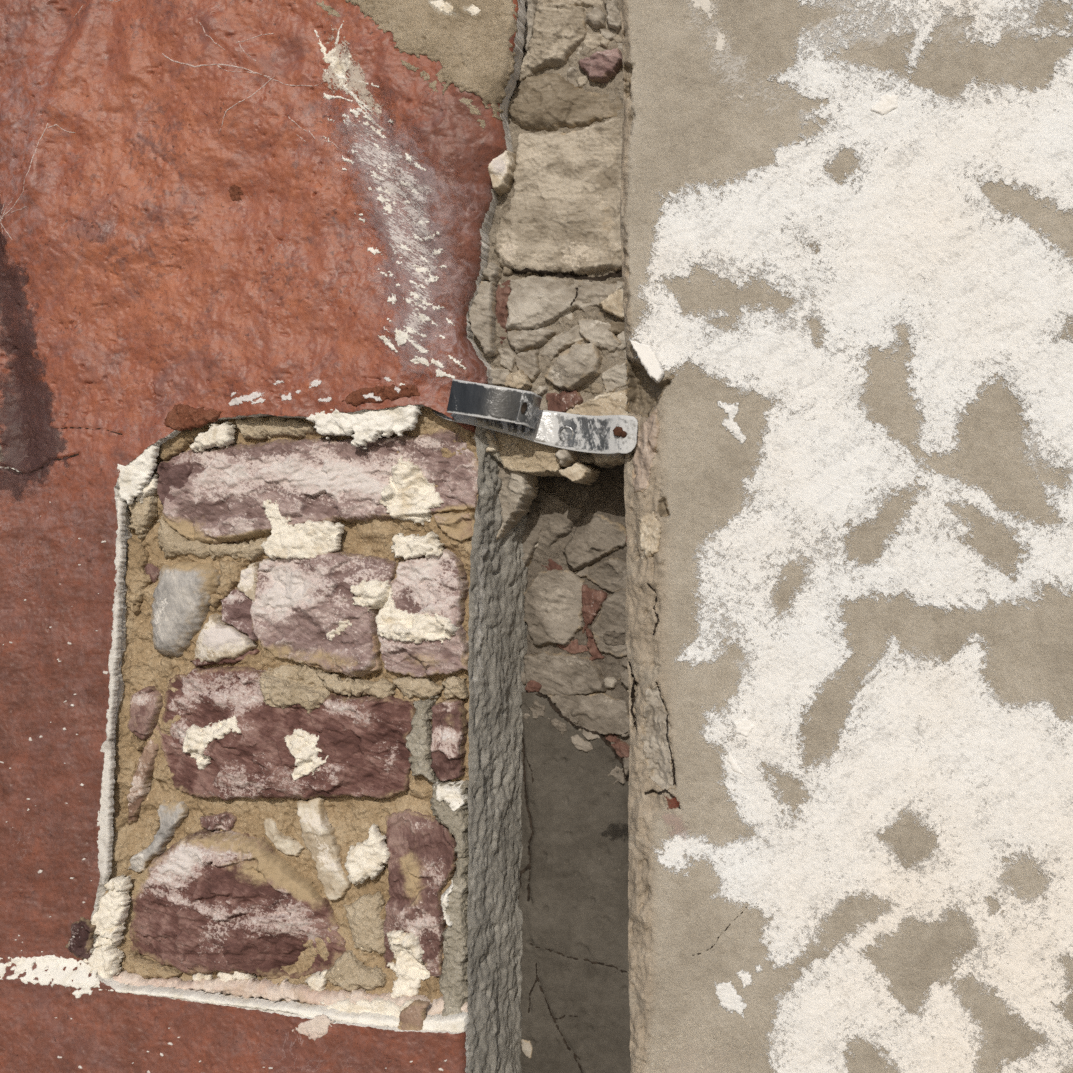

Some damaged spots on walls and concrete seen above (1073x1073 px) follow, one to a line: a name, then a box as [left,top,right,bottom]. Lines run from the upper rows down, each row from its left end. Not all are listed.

peeling [316,0,518,131]
efflorescence [328,100,466,379]
damp [0,233,68,499]
crack [647,583,659,635]
flaking render [0,384,500,1032]
crack [535,661,681,809]
crack [528,943,627,1073]